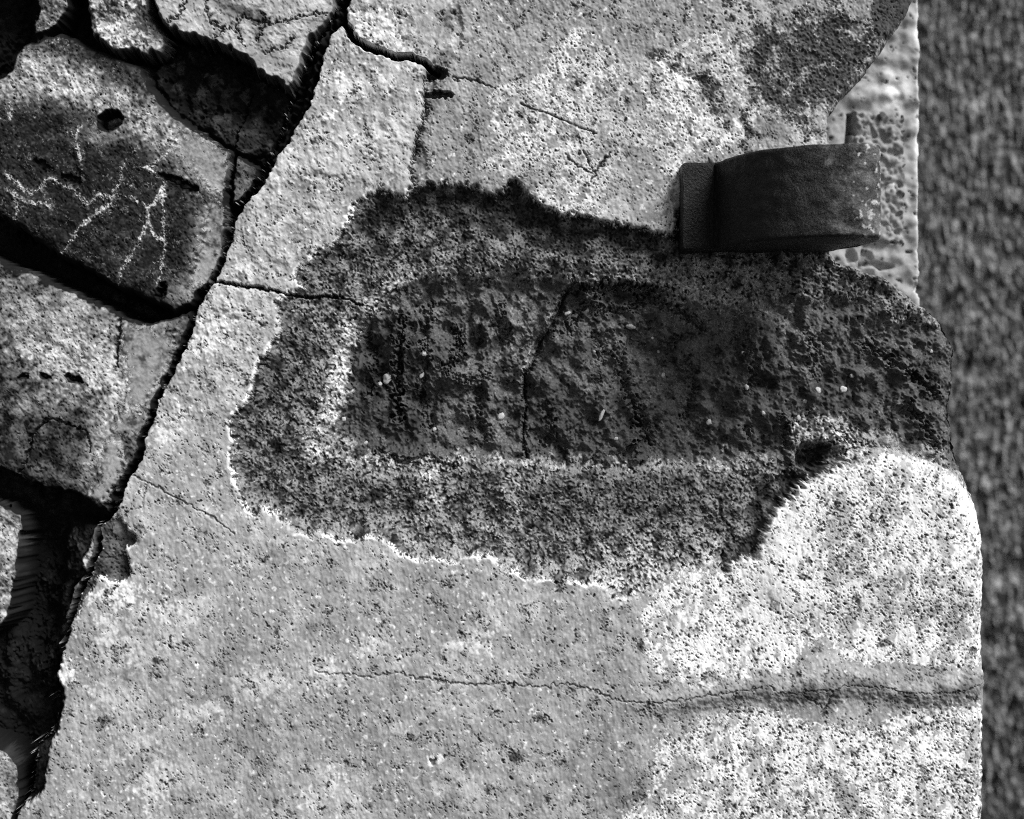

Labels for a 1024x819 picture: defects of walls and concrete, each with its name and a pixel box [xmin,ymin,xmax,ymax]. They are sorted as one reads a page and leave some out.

crack [167,0,496,245]
crack [218,268,363,306]
crack [115,317,123,368]
crack [20,418,92,473]
crack [97,472,236,541]
crack [315,671,984,711]